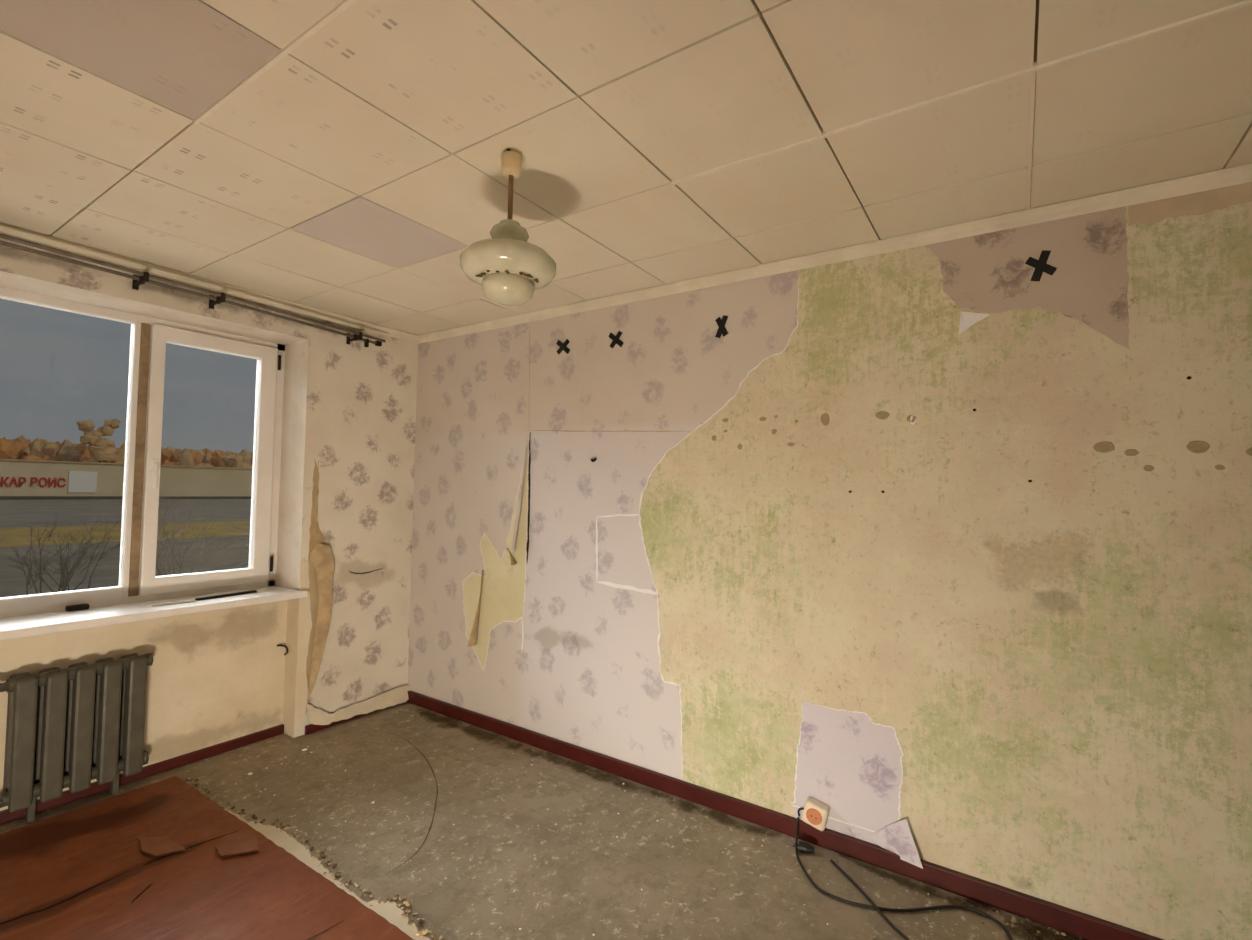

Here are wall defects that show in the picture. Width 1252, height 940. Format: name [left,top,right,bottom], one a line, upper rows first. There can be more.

peeling [294,458,334,727]
flaking render [463,445,529,668]
peeling [639,201,1252,940]